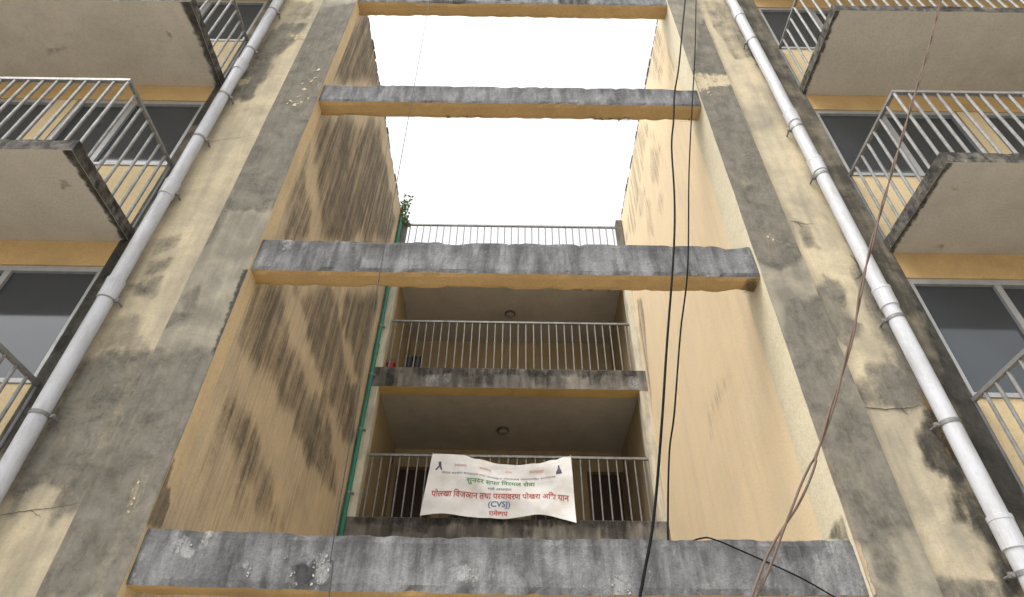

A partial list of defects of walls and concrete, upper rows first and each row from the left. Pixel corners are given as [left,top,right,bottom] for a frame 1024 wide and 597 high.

leakage [181,2,378,211]
leakage [286,119,394,242]
leakage [692,13,812,269]
leakage [803,10,840,95]
leakage [8,269,248,597]
leakage [247,289,377,488]
leakage [786,271,1024,597]
peeling [172,531,213,558]
spalling [283,554,329,589]